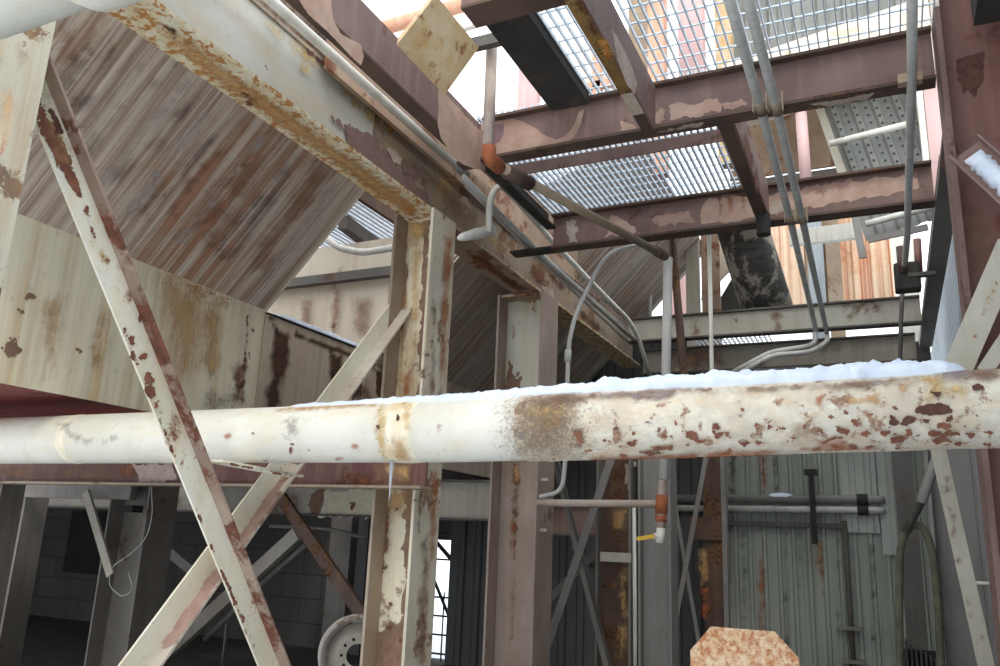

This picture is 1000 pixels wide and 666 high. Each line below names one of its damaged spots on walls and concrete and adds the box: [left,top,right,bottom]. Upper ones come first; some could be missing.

rust [36,97,96,238]
rust [164,26,425,239]
peeling [331,113,429,205]
peeling [655,98,747,124]
peeling [652,195,755,227]
peeling [769,175,919,215]
peeling [416,220,431,395]
rust [123,327,159,409]
rust [541,395,583,405]
rust [828,381,879,427]
rust [707,423,771,481]
peeling [375,490,413,666]